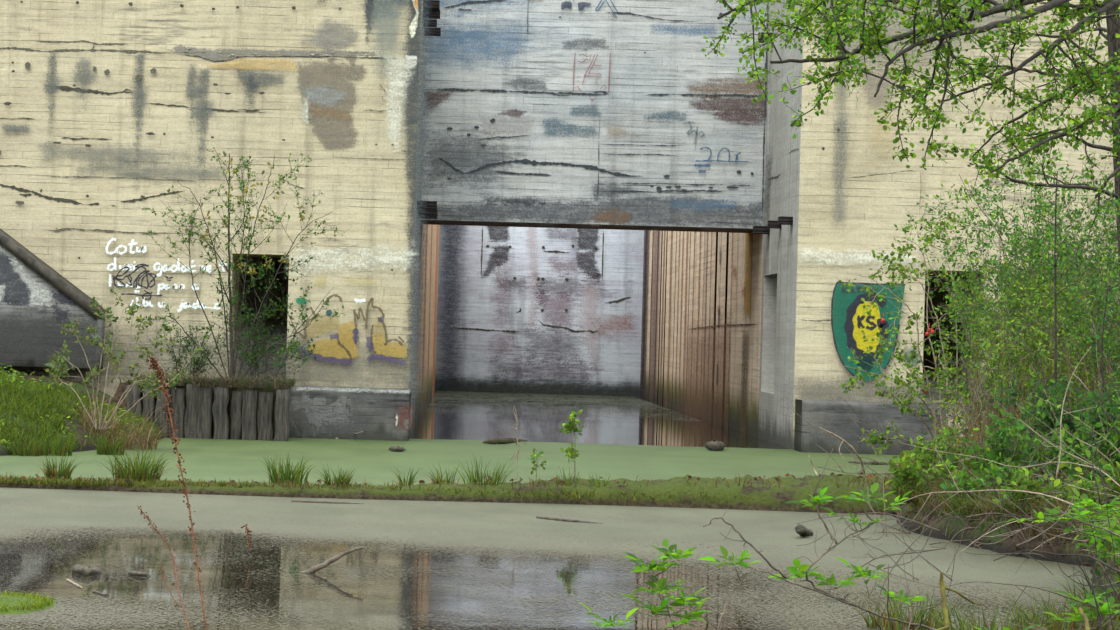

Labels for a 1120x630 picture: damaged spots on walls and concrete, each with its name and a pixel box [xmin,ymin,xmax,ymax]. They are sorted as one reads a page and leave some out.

damp [0,0,771,433]